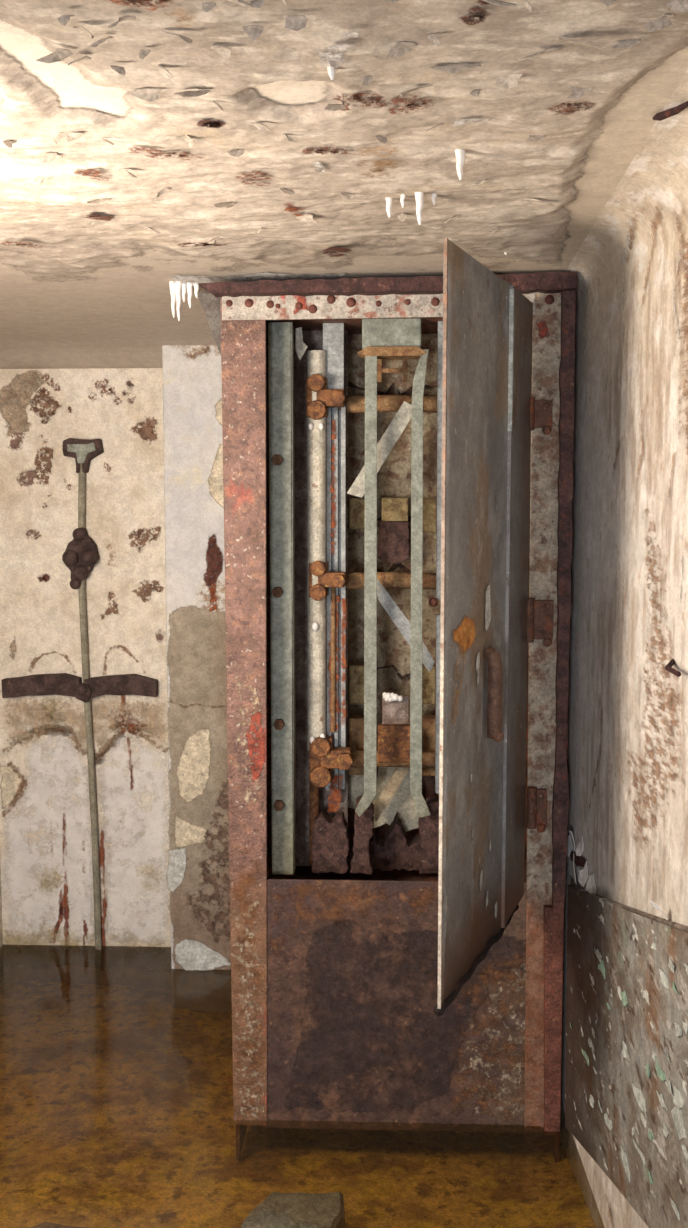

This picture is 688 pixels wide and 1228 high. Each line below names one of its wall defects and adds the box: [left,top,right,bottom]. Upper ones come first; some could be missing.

rust [109,0,192,26]
flaking render [0,0,688,282]
flaking render [0,370,60,450]
flaking render [131,417,157,444]
flaking render [17,447,54,486]
flaking render [128,526,161,552]
flaking render [101,592,118,620]
flaking render [132,580,164,602]
rust [201,534,225,611]
flaking render [156,606,231,973]
rust [52,814,107,949]